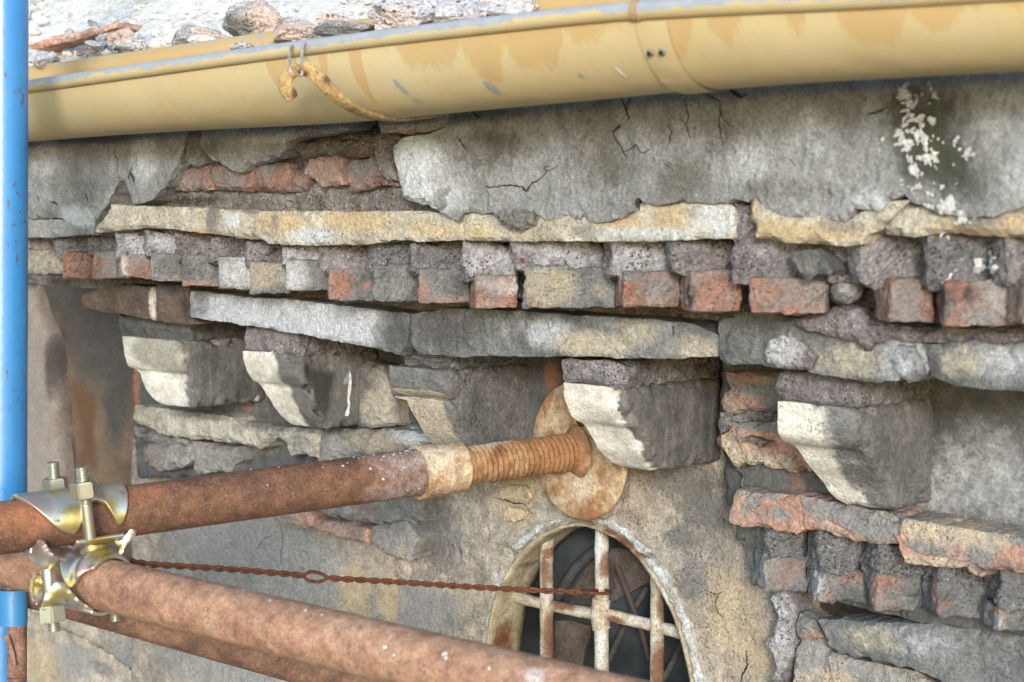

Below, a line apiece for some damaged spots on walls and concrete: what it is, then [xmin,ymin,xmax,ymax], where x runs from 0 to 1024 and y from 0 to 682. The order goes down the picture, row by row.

spalling [176,113,451,193]
crack [485,165,558,192]
crack [612,89,747,169]
peeling [827,188,893,223]
water stain [890,93,976,193]
flaking render [718,335,830,493]
spalling [813,519,861,541]
spalling [897,535,998,577]